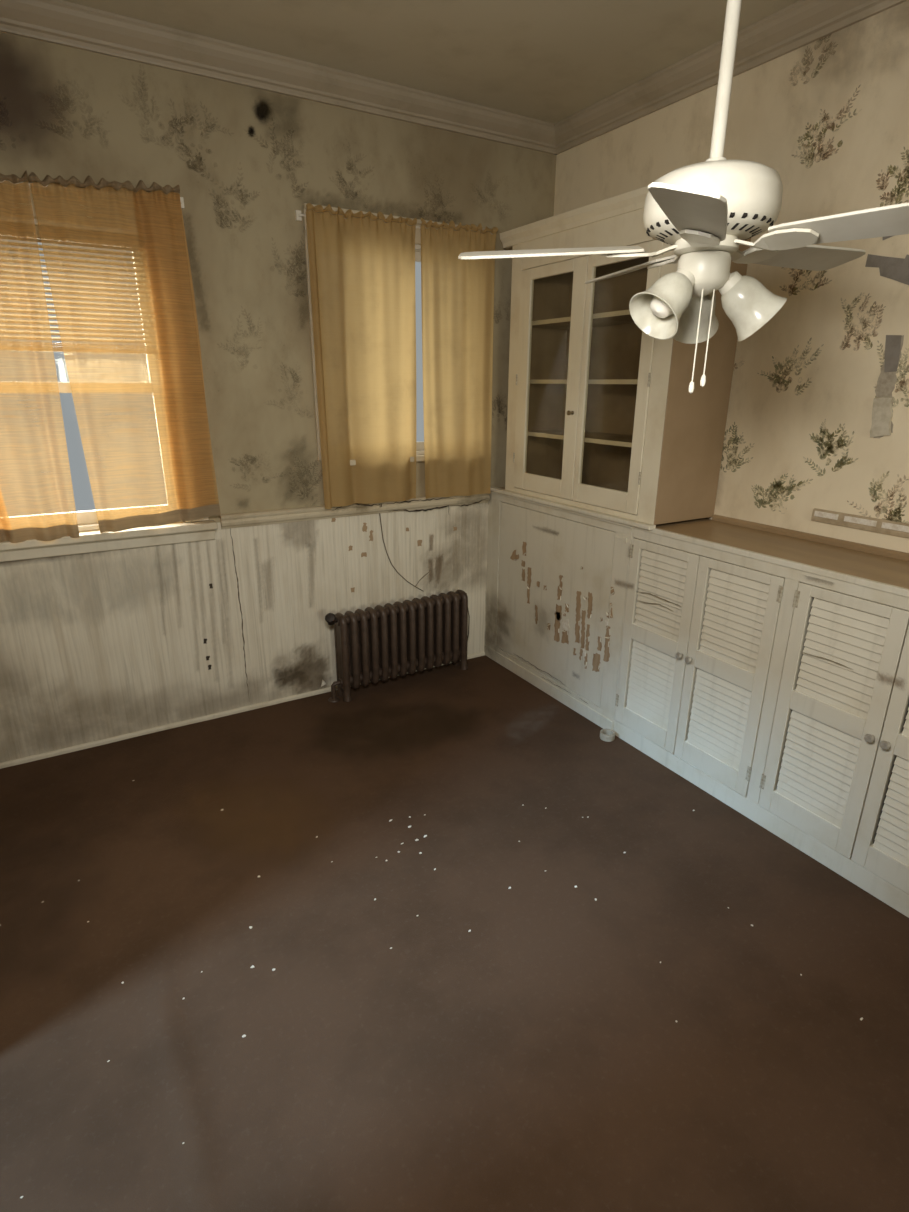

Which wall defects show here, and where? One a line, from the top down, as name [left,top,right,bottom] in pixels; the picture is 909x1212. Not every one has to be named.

leakage [0,59,37,129]
leakage [249,101,270,135]
peeling [510,542,615,672]